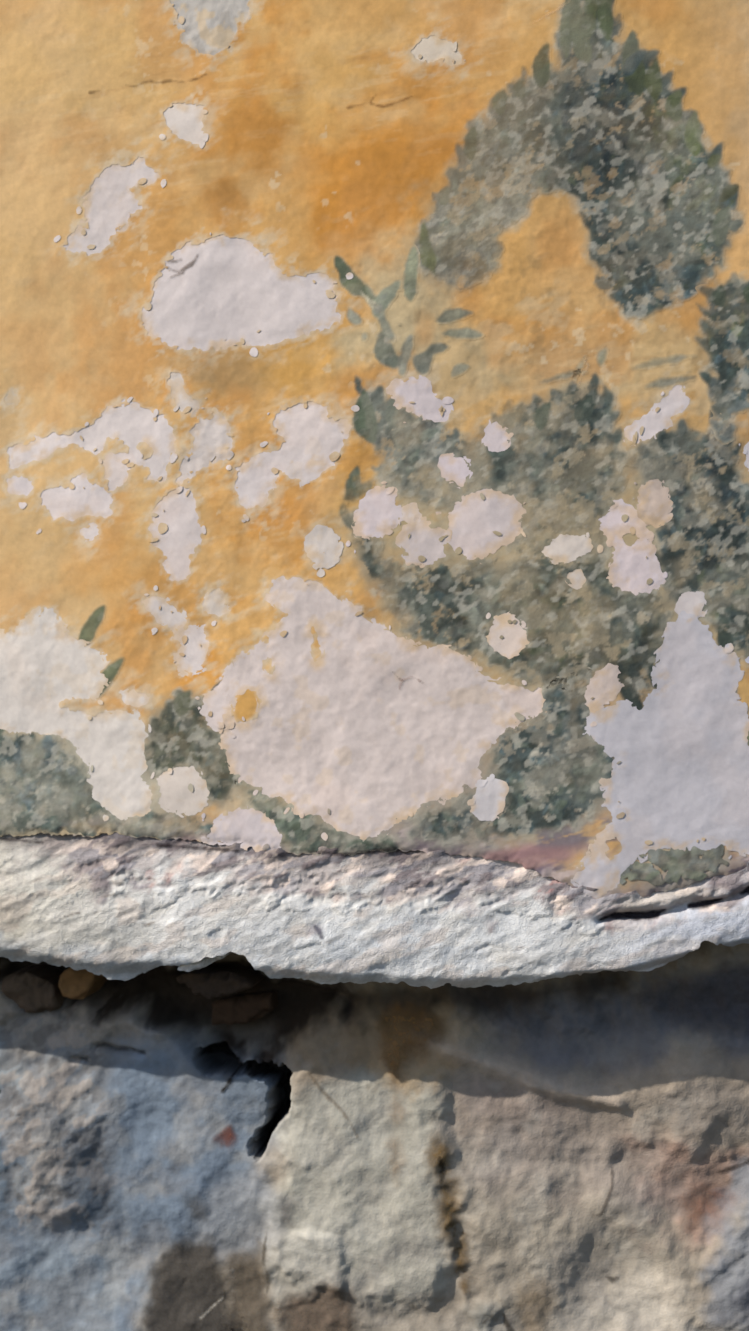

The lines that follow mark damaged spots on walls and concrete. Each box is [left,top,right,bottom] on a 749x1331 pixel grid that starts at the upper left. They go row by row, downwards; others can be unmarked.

flaking render [170,0,252,55]
flaking render [54,157,166,256]
flaking render [142,232,353,357]
flaking render [623,385,690,446]
flaking render [739,442,749,471]
flaking render [542,479,673,596]
flaking render [0,372,547,852]
flaking render [571,591,749,899]
crack [599,886,749,920]
crack [202,1041,293,1155]